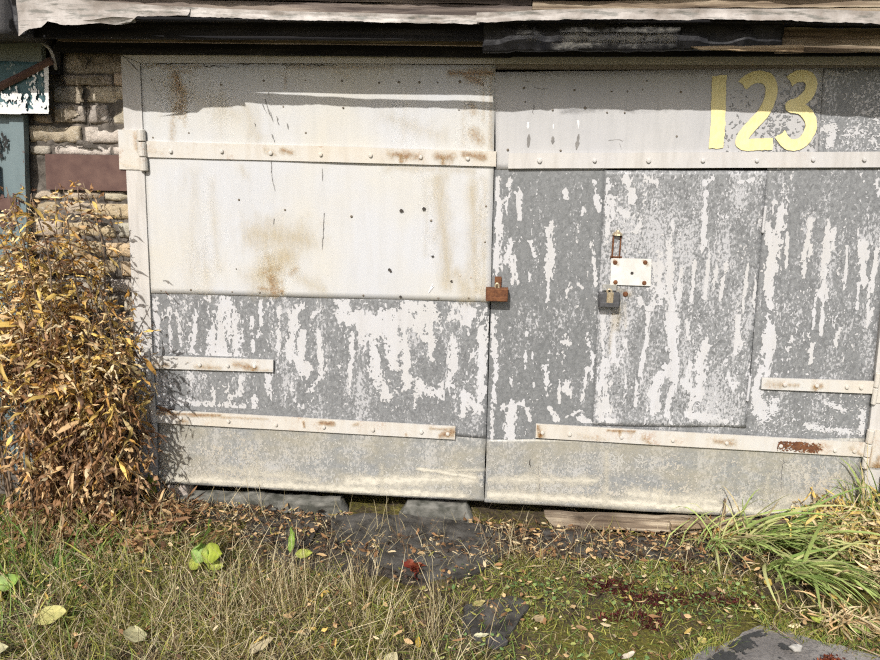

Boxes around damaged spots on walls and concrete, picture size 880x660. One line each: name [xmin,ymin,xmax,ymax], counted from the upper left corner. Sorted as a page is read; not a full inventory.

peeling [0,66,107,122]
peeling [152,171,880,511]